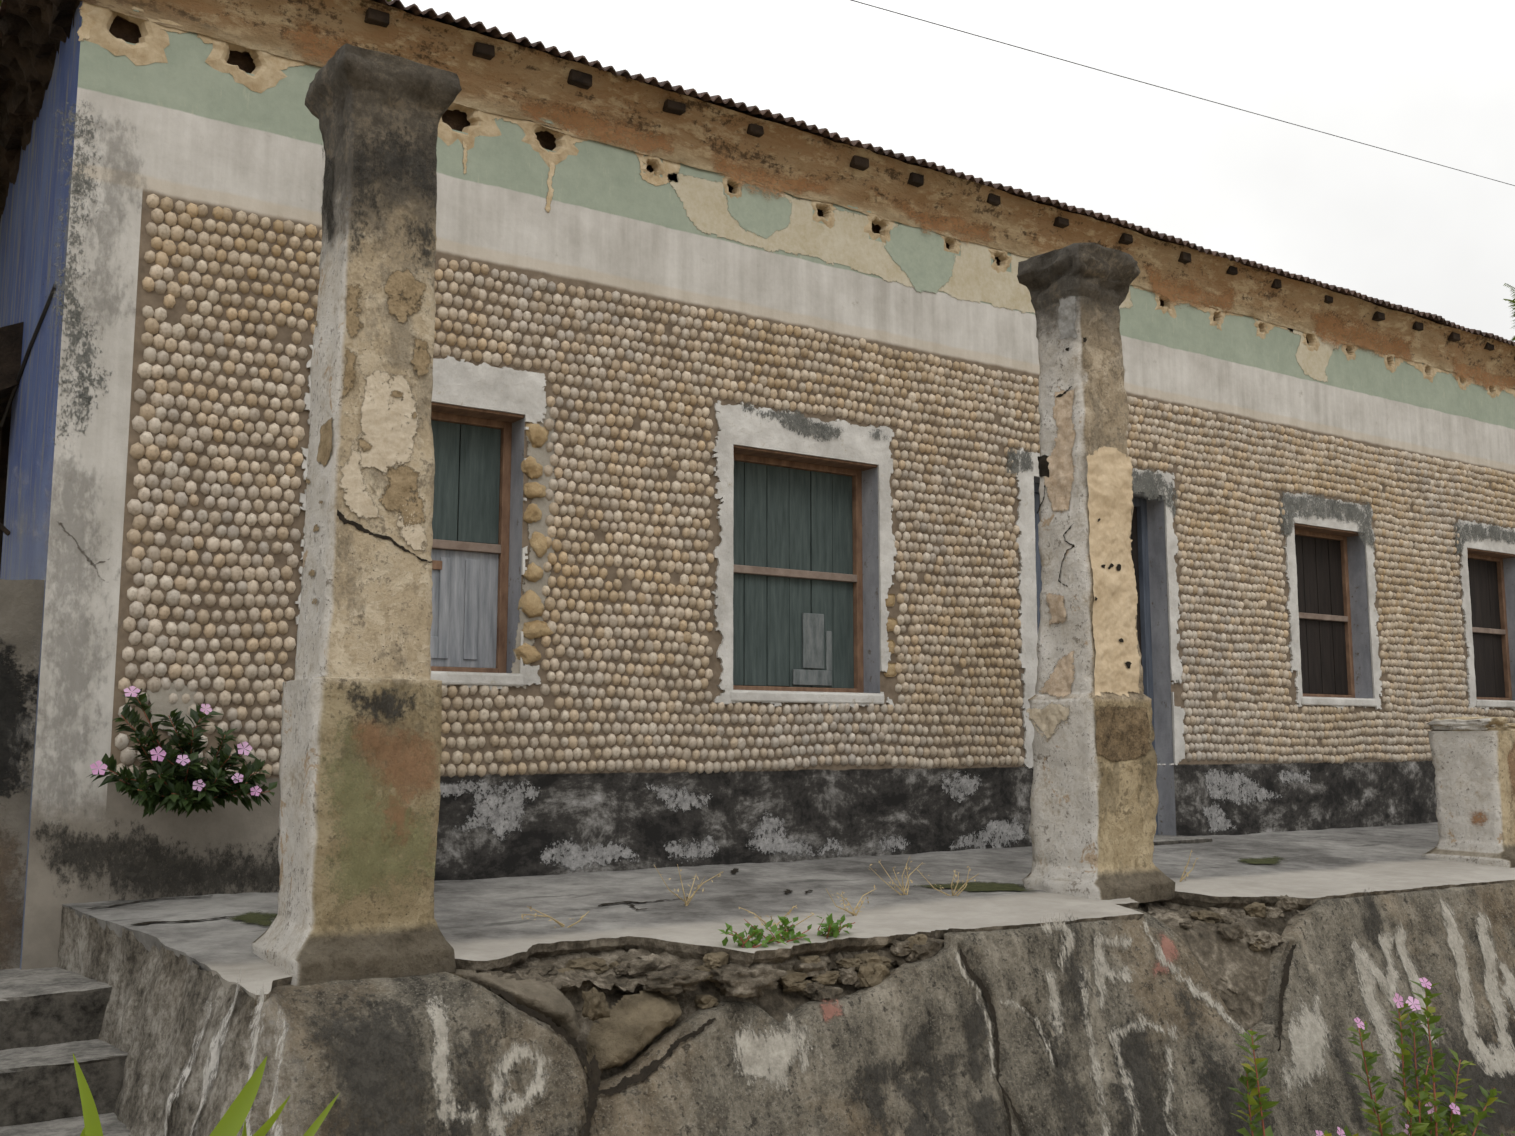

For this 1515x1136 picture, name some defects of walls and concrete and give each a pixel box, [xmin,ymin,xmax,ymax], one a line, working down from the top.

flaking render [77,1,97,42]
leakage [43,102,112,444]
leakage [321,126,437,266]
peeling [635,152,1035,313]
flaking render [317,269,431,552]
flaking render [1038,388,1076,513]
crack [58,522,105,581]
crack [337,509,432,563]
leakage [0,639,39,798]
spalling [1095,704,1151,762]
leakage [35,821,280,926]
leakage [913,881,1036,892]